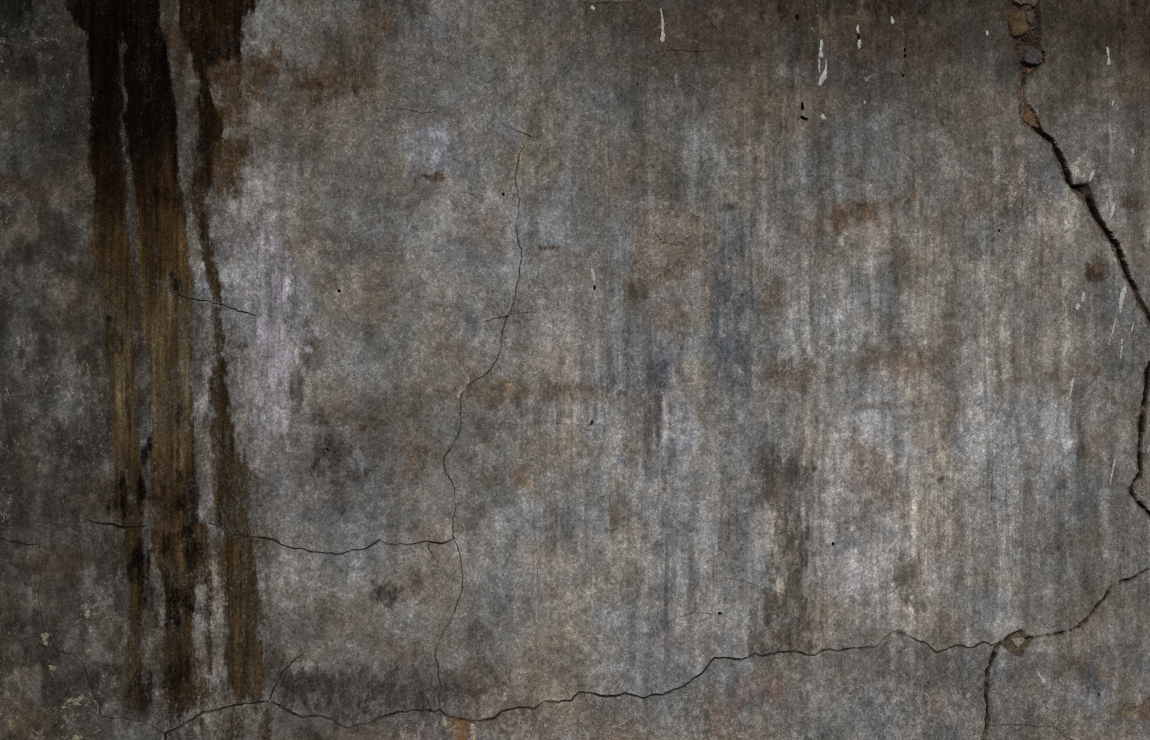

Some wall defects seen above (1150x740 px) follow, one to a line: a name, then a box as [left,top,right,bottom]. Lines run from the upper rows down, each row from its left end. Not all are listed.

flaking render [1003,0,1052,85]
water stain [1,0,321,740]
crack [0,119,1079,740]
crack [1013,84,1150,526]
crack [1026,561,1150,643]